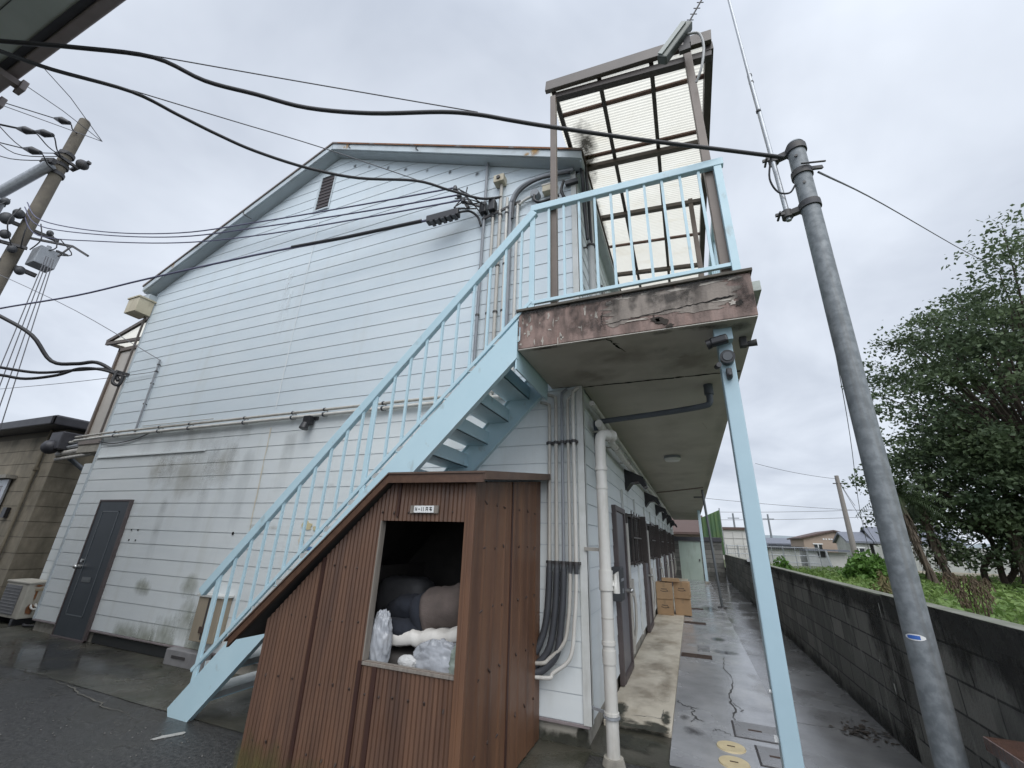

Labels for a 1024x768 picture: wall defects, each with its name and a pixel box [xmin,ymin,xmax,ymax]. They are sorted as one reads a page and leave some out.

peeling [578,276,743,332]
crack [636,657,743,735]